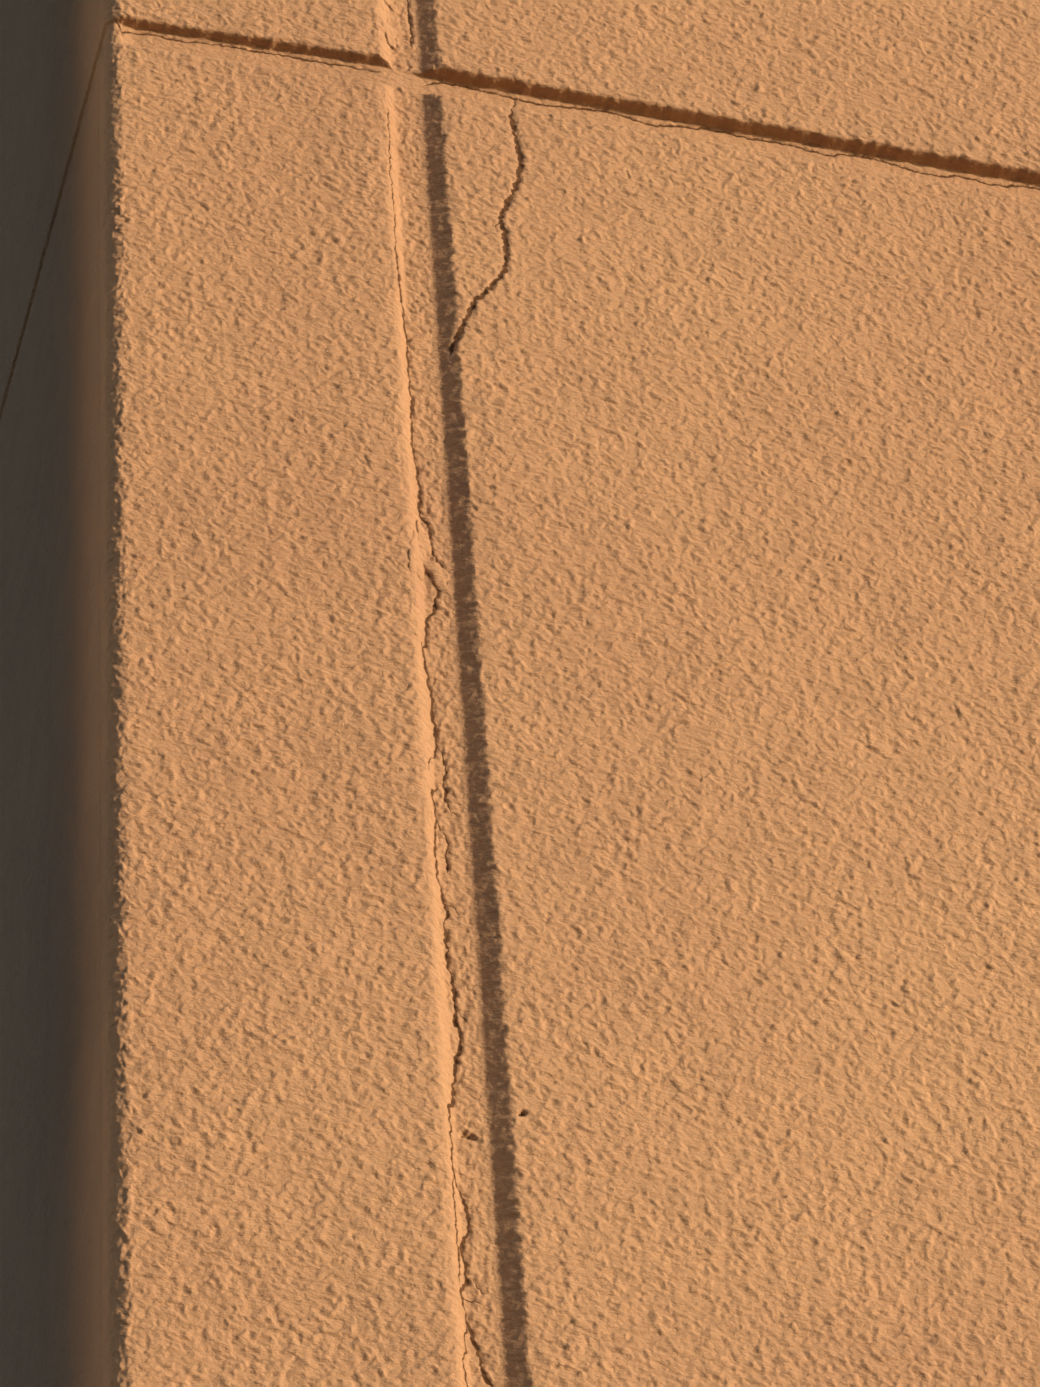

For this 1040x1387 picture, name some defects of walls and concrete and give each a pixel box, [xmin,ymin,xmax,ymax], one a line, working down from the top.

crack [387,107,493,1387]
crack [425,82,1040,354]